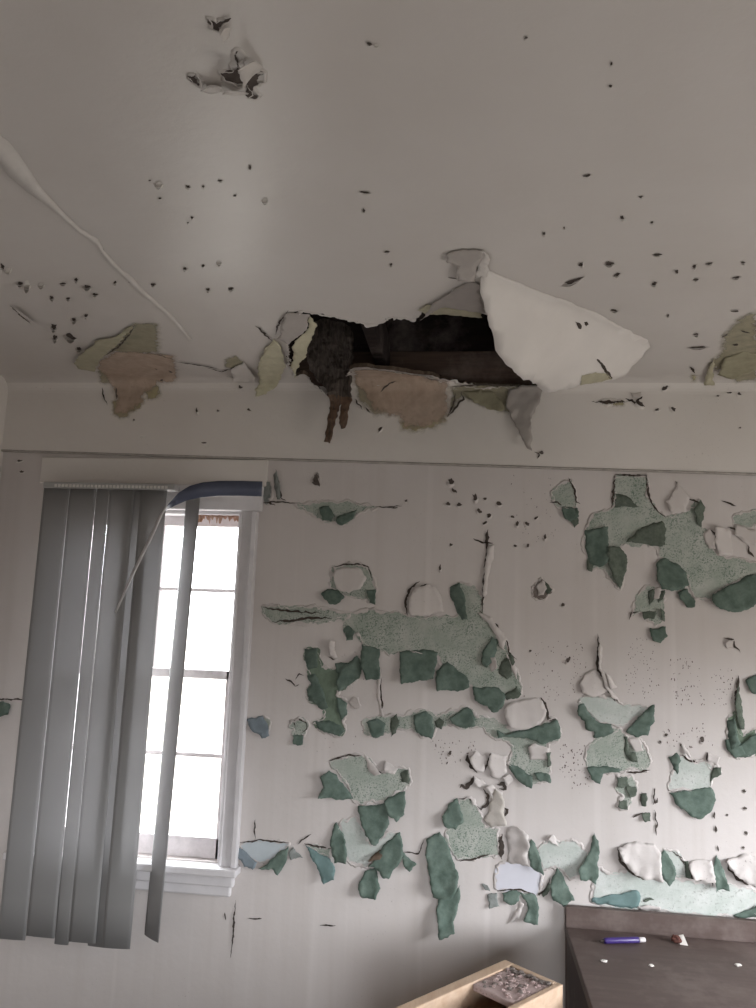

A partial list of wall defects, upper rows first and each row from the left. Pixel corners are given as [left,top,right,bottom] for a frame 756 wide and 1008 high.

peeling [186,16,268,100]
peeling [446,249,490,282]
peeling [237,311,288,397]
peeling [506,385,544,459]
spalling [592,392,676,413]
peeling [263,471,408,527]
crack [473,530,495,611]
peeling [549,474,756,643]
peeling [261,561,562,789]
peeling [577,694,668,822]
peeling [667,675,756,819]
peeling [238,752,756,940]